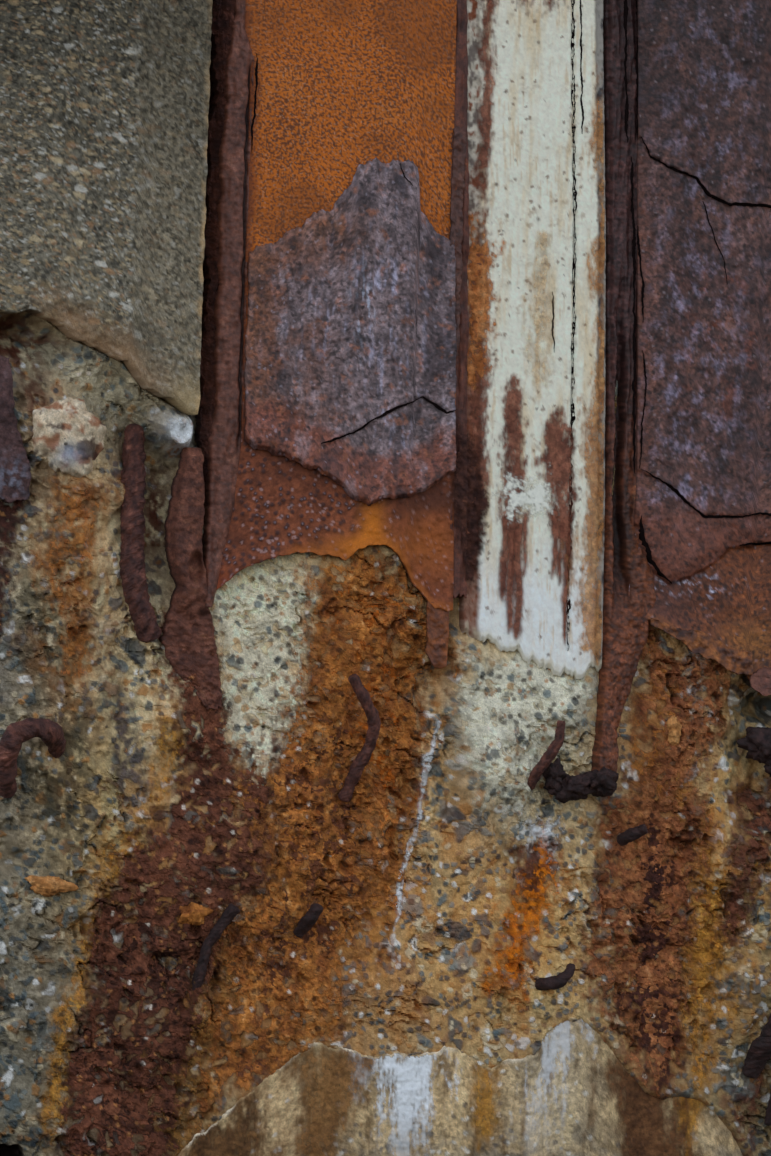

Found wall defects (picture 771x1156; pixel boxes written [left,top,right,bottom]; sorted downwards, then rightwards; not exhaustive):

spalling [24,343,163,643]
corrosion [43,545,463,1156]
spalling [209,559,313,775]
crack [321,396,458,444]
corrosion [244,0,605,665]
corrosion [481,841,559,1000]
spalling [453,653,597,821]
spalling [535,963,575,991]
crack [551,0,584,651]
crack [638,515,672,584]
corrosion [582,618,771,1156]
crack [623,0,771,546]